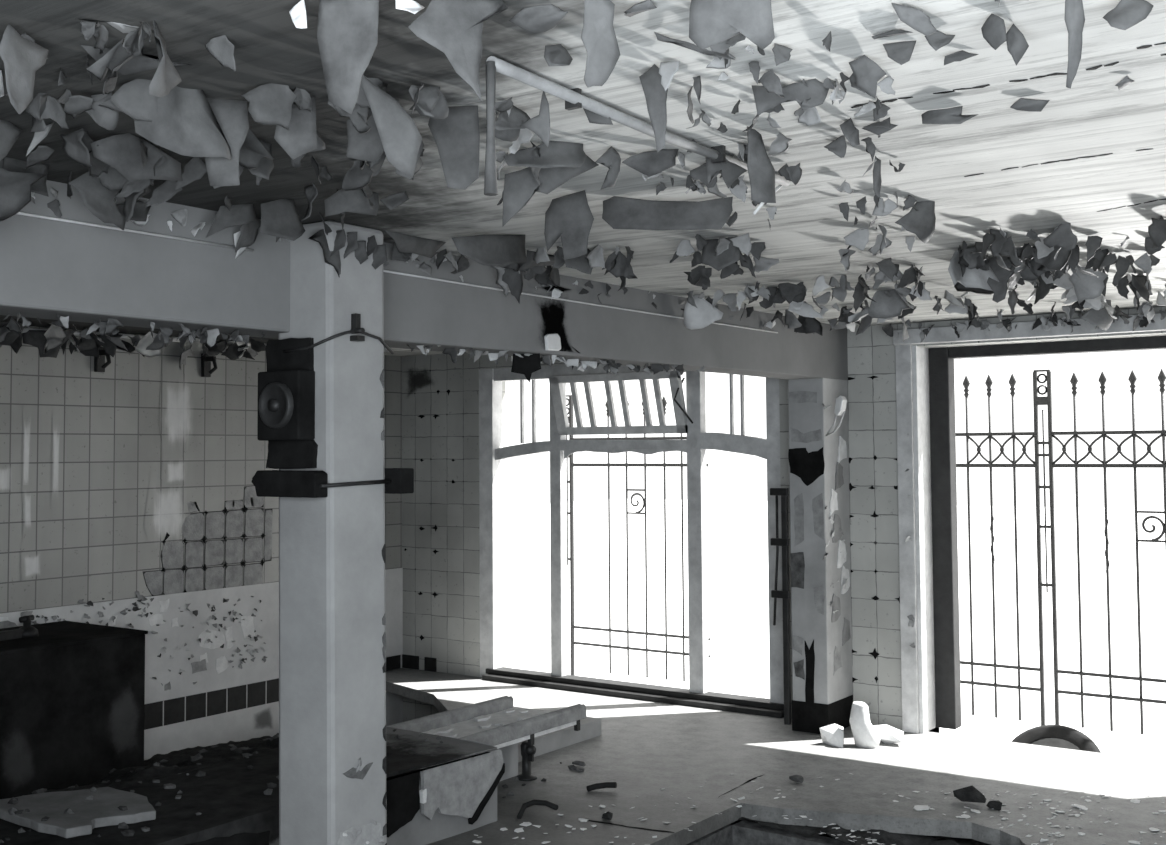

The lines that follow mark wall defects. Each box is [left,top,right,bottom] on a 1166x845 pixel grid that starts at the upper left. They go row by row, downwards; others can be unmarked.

peeling [0,0,1166,344]
peeling [0,312,266,369]
peeling [407,345,706,377]
peeling [0,476,272,691]
flaking render [788,427,851,680]
spalling [337,749,505,845]